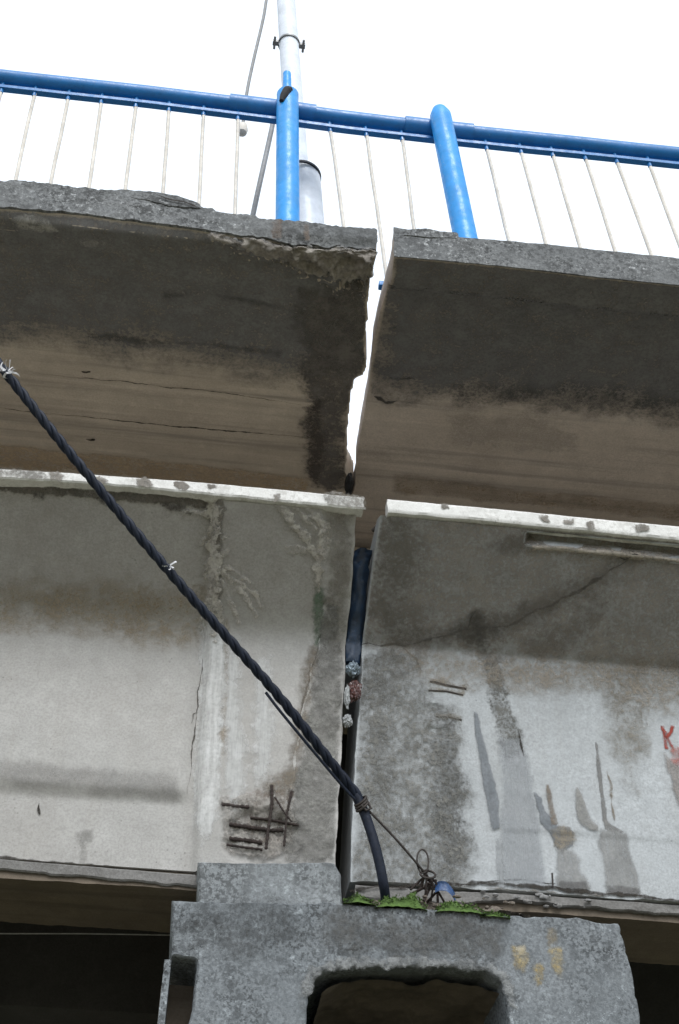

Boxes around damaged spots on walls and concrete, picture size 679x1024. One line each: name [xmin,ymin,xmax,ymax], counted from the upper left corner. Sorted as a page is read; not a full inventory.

spalling [208,232,378,286]
crack [58,414,304,438]
leakage [0,279,365,492]
leakage [0,500,318,836]
crack [190,641,205,775]
crack [362,553,639,668]
leakage [474,712,505,888]
leakage [534,742,640,895]